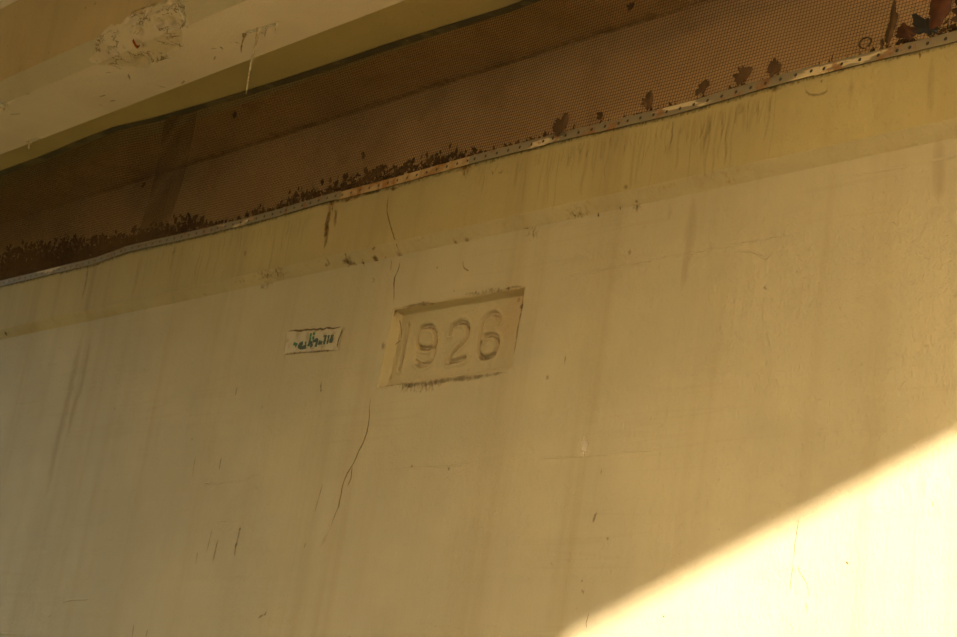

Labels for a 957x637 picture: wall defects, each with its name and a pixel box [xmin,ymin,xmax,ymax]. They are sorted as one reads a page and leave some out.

spalling [89,0,189,68]
crack [334,406,370,517]